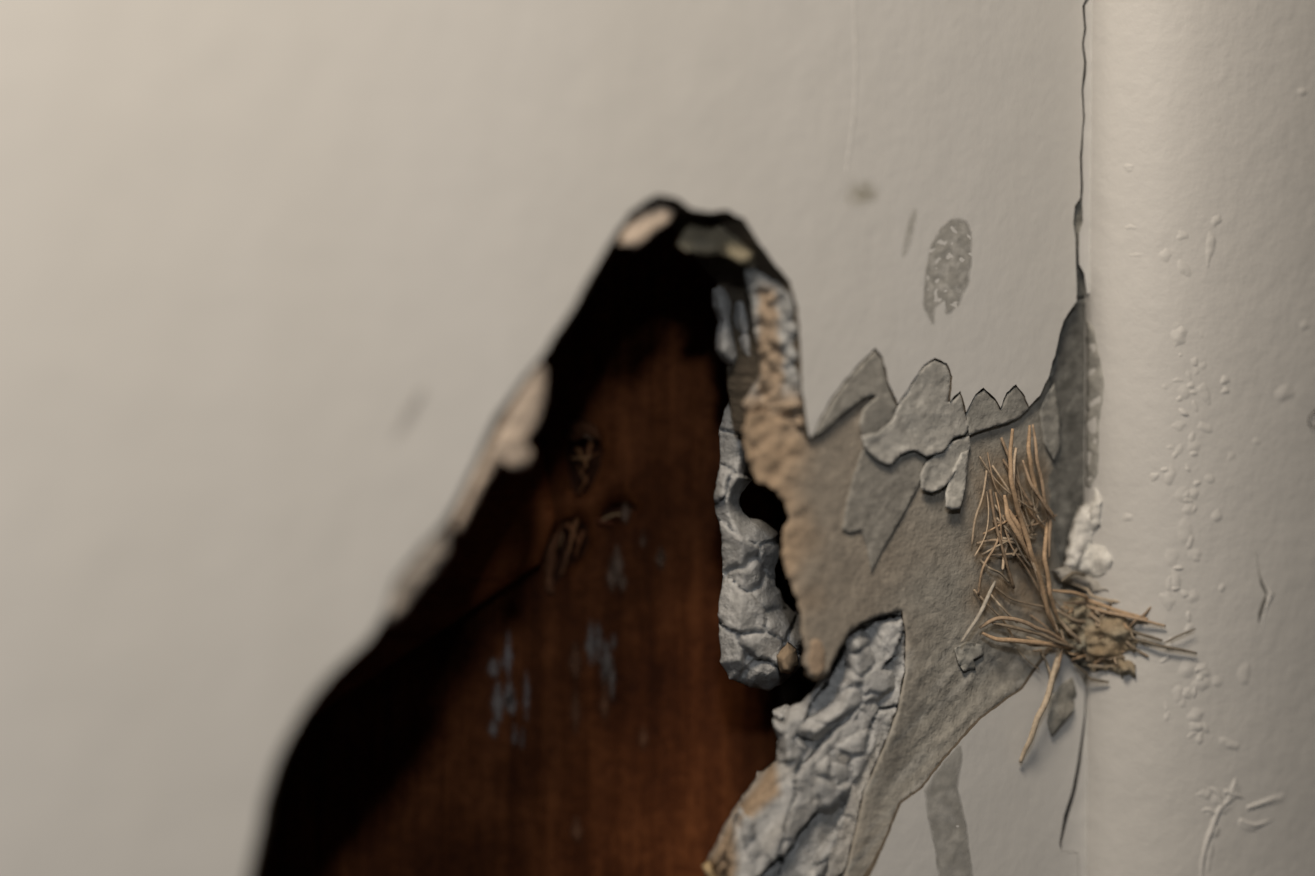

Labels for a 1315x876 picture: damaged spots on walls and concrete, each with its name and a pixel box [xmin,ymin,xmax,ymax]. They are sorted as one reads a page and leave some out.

spalling [248,201,675,876]
peeling [677,220,1113,876]
crack [1073,150,1085,297]